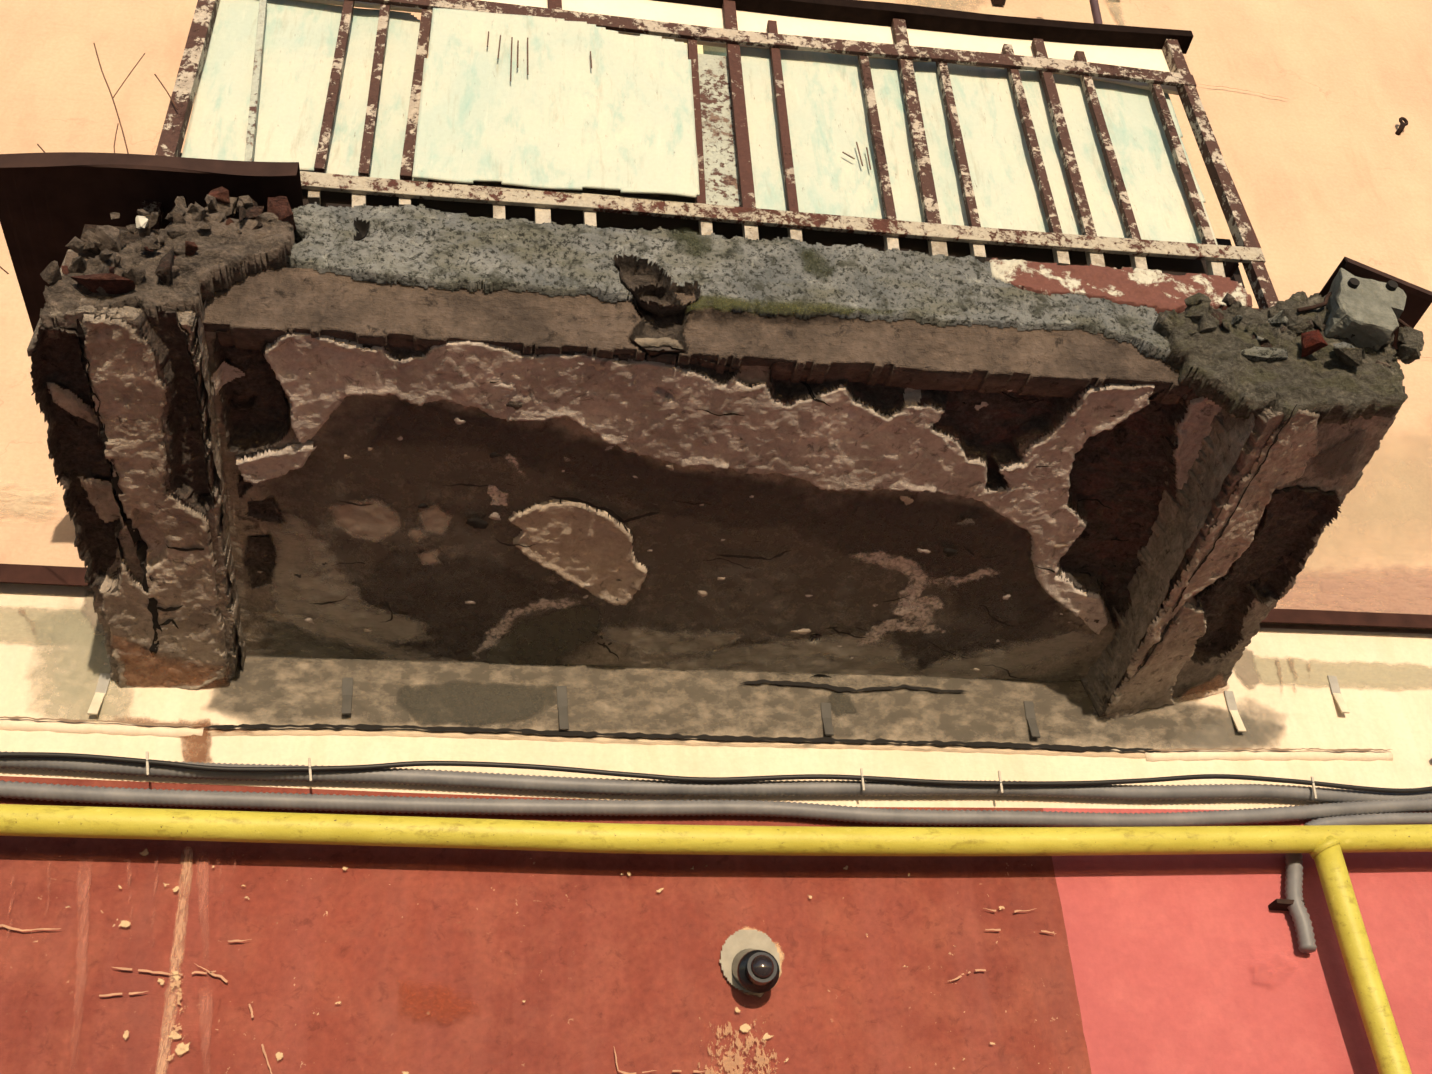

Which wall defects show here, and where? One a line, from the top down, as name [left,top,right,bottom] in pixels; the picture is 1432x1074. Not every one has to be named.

leakage [919,0,963,9]
spalling [40,186,296,297]
spalling [354,217,370,241]
spalling [1153,292,1424,368]
crack [696,408,744,416]
crack [801,382,831,407]
crack [76,319,204,657]
flaking render [0,254,1222,690]
spalling [1103,409,1341,719]
crack [740,639,1027,692]
flaking render [828,691,857,715]
crack [0,716,1392,753]